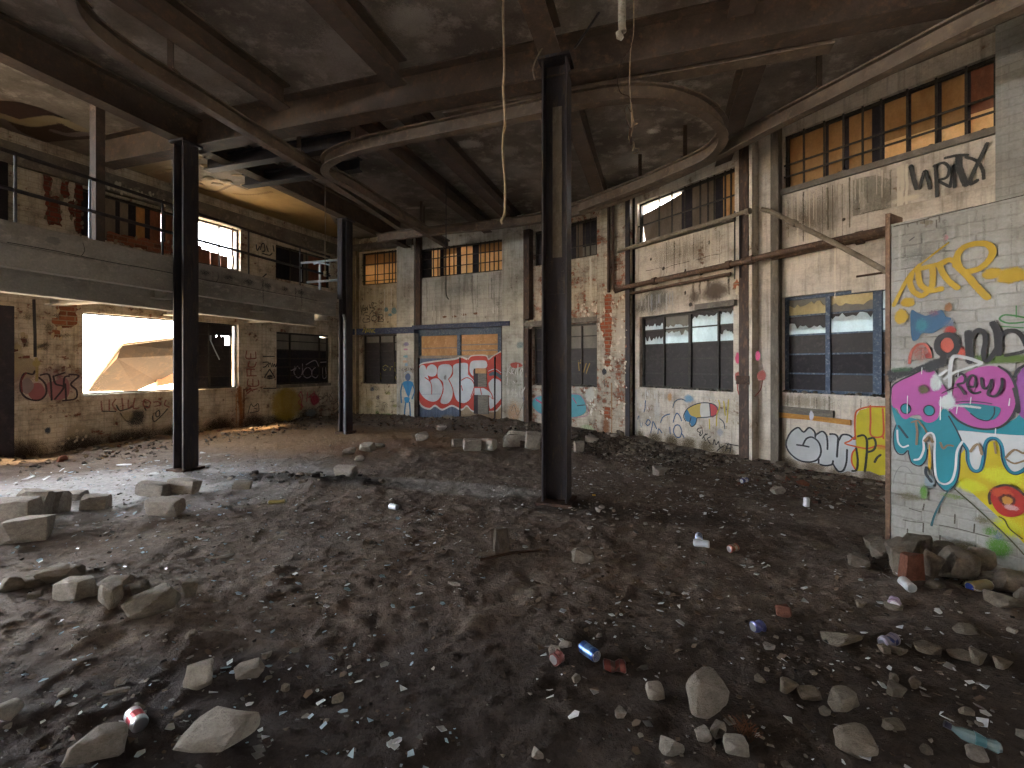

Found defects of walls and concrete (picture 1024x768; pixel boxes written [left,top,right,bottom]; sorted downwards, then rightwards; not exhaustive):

flaking render [43,174,84,237]
leakage [785,164,921,298]
flaking render [51,305,80,341]
flaking render [580,289,665,434]